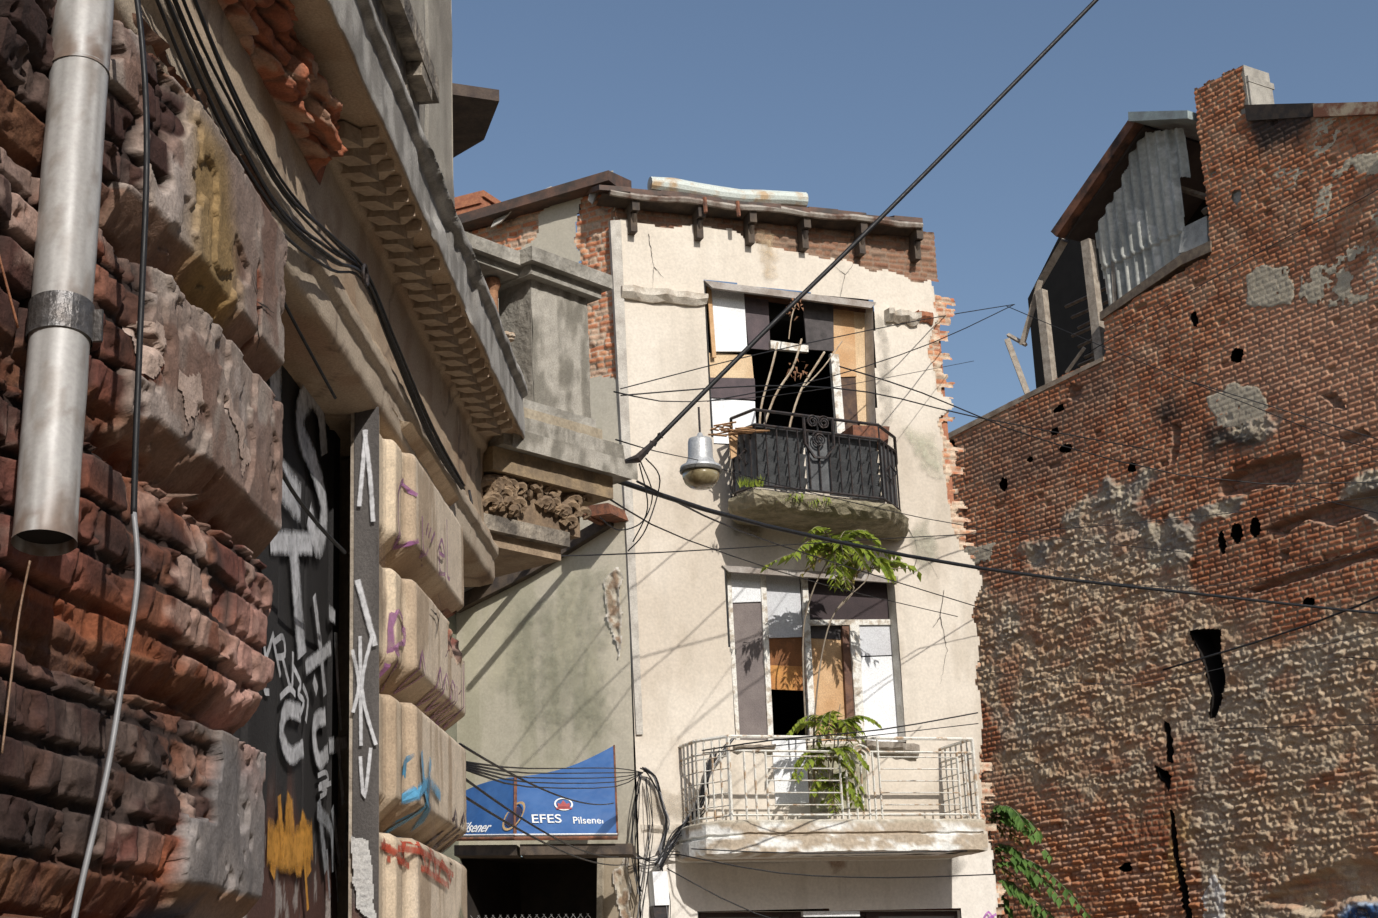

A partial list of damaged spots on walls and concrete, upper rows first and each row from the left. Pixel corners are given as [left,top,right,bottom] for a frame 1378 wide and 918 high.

peeling [122,320,204,432]
peeling [224,388,251,475]
flaking render [574,193,976,559]
spalling [1051,382,1084,453]
spalling [1320,391,1347,412]
spalling [1340,425,1372,450]
spalling [1217,451,1304,498]
spalling [1218,486,1378,605]
spalling [979,750,997,841]
spalling [996,883,1006,915]
spalling [1119,862,1133,872]